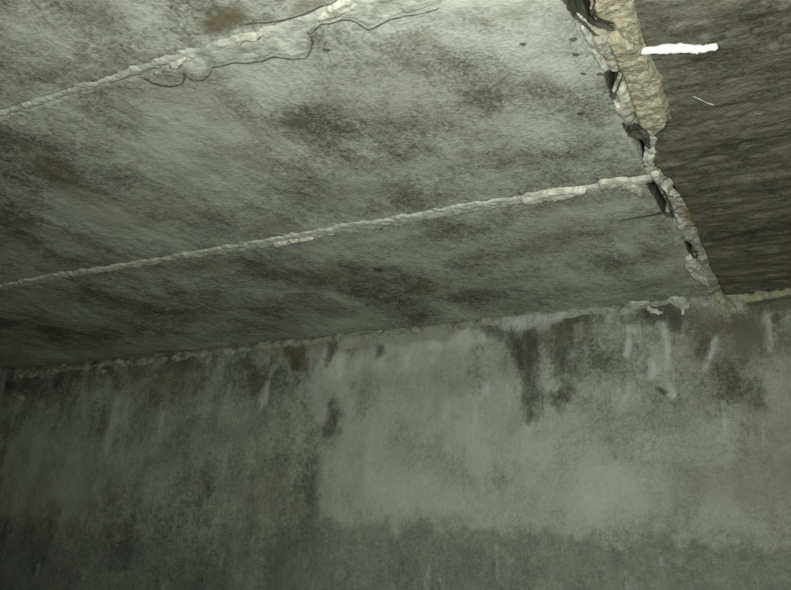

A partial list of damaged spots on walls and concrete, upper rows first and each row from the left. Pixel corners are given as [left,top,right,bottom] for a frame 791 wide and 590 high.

crack [141,0,437,88]
spalling [563,0,721,294]
peeling [521,186,587,205]
crack [621,211,674,221]
water stain [488,321,543,417]
water stain [646,303,681,380]